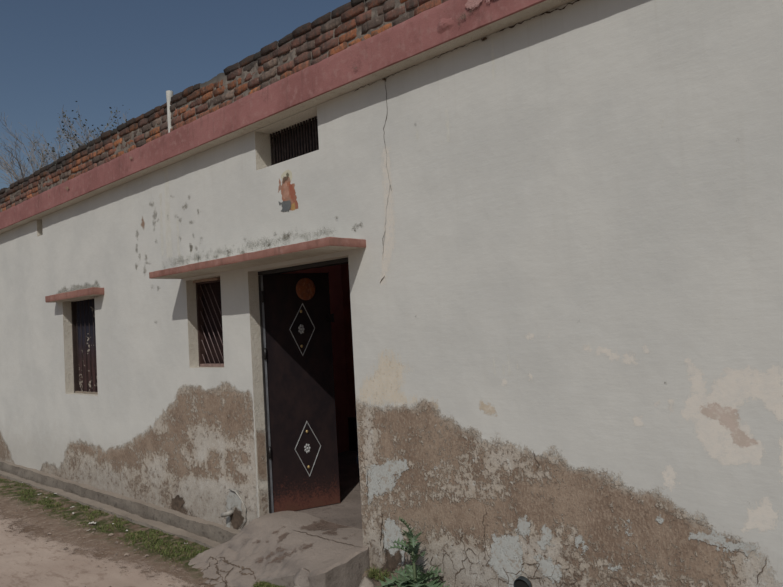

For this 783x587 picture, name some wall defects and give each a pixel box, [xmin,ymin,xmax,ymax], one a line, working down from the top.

peeling [465,0,495,10]
crack [355,0,580,286]
peeling [39,381,269,530]
peeling [356,348,783,587]
crack [198,556,257,587]
crack [430,512,581,587]